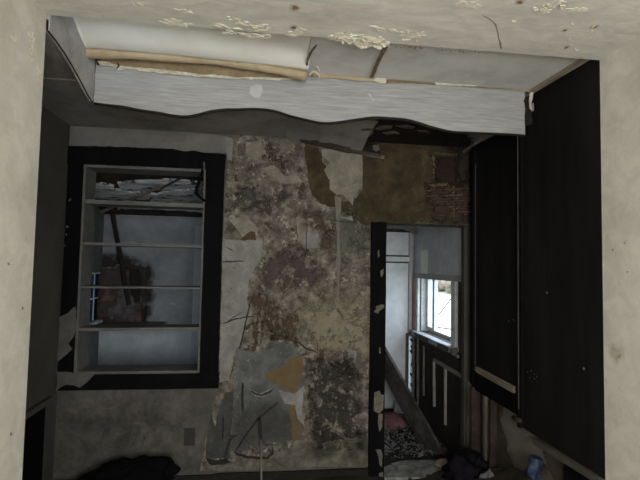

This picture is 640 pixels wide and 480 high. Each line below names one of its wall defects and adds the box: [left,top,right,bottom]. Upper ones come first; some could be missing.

peeling [212,16,271,38]
peeling [327,26,426,50]
flaking render [304,142,471,226]
leakage [263,243,320,290]
crack [222,299,279,459]
flaking render [206,231,384,477]
leakage [292,294,370,456]